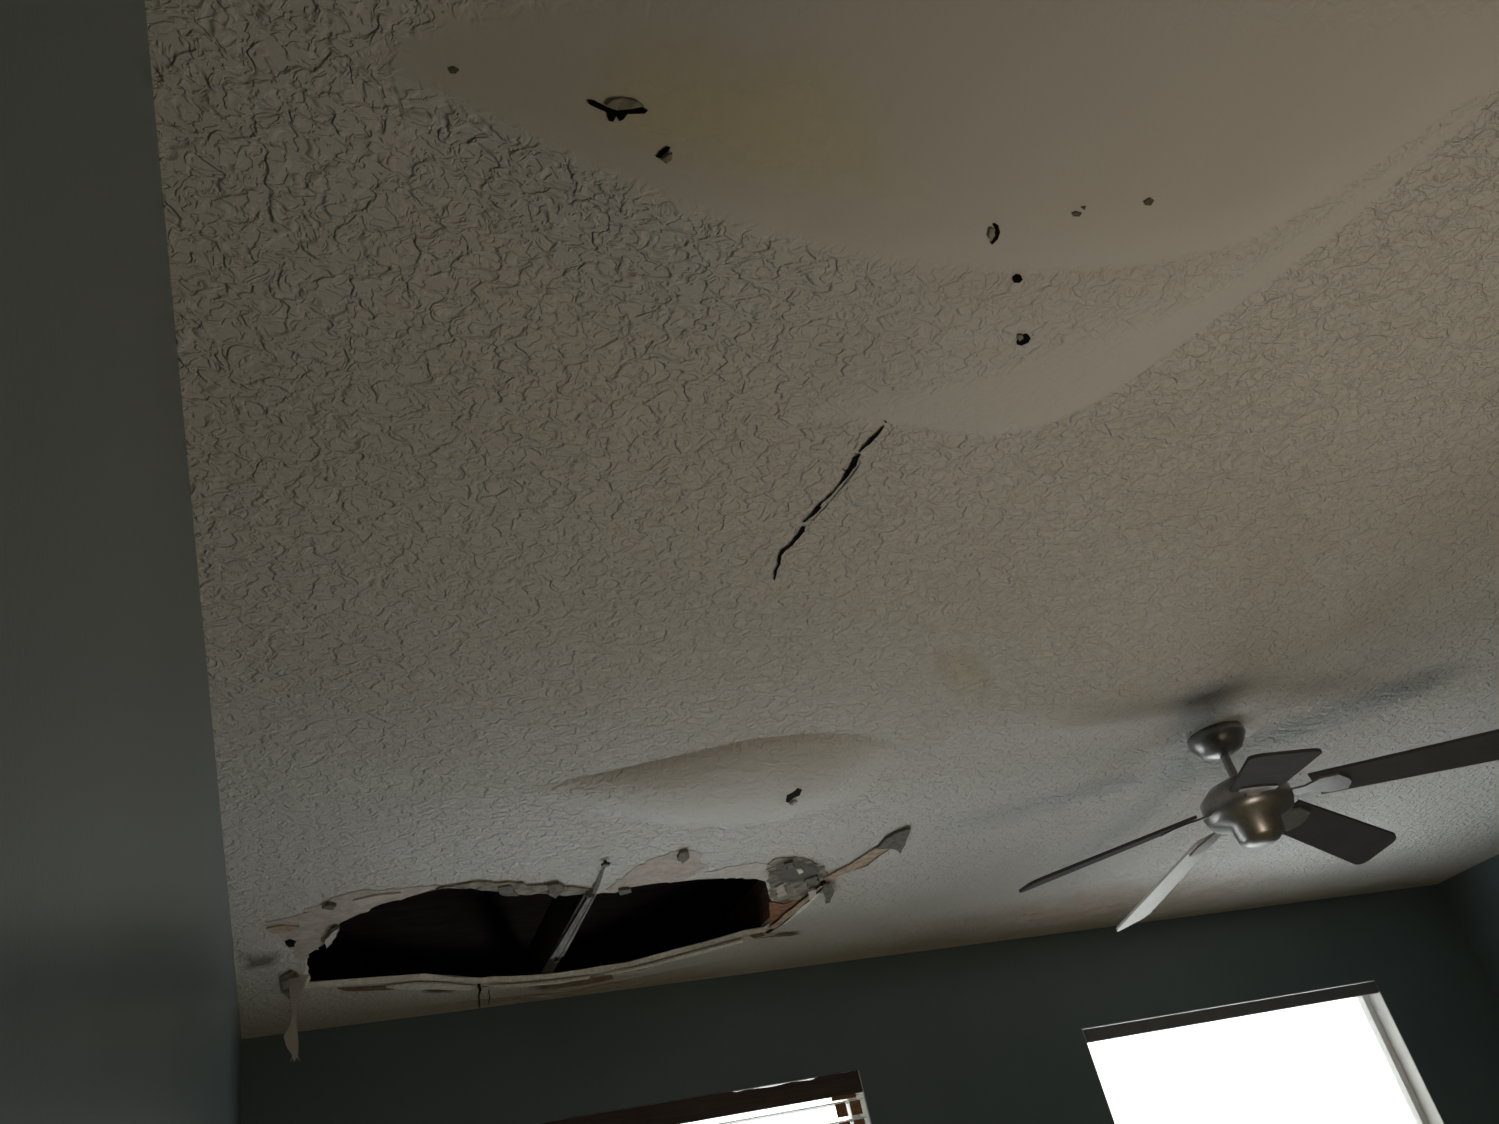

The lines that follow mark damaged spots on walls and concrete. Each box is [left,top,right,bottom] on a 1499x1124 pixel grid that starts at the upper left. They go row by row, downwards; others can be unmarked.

crack [774,420,887,580]
peeling [265,885,441,961]